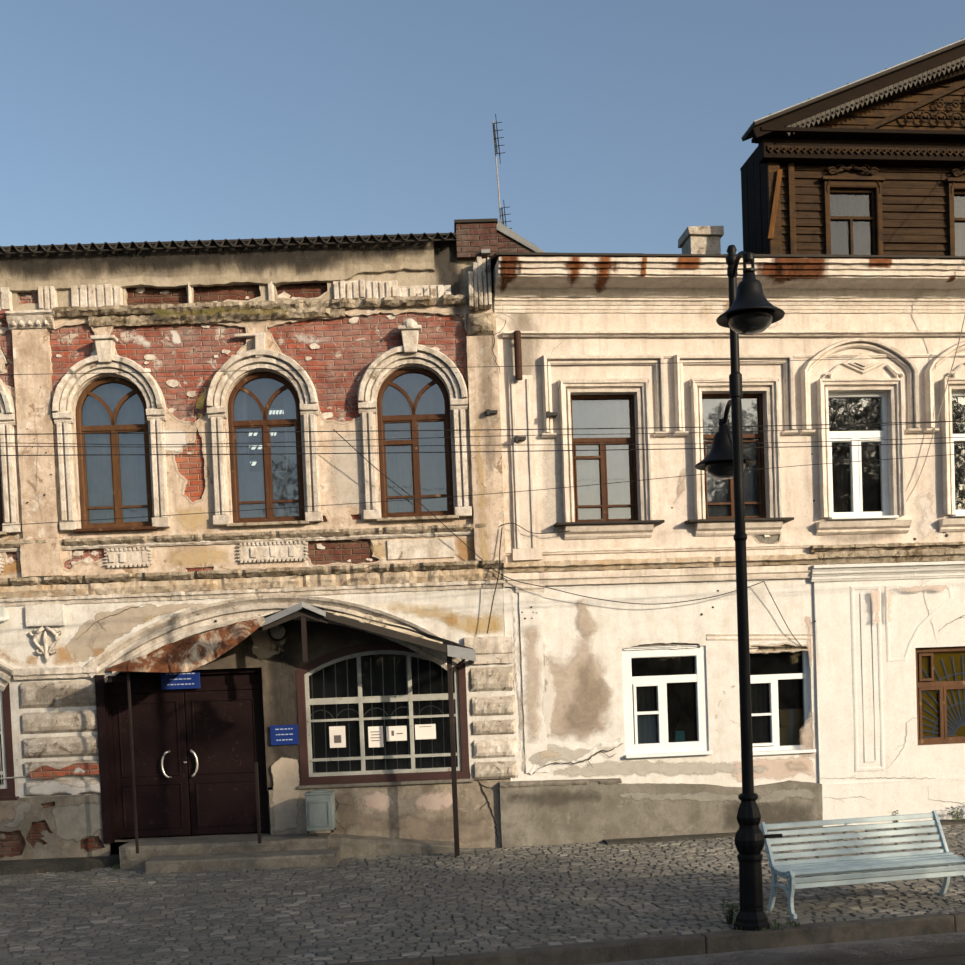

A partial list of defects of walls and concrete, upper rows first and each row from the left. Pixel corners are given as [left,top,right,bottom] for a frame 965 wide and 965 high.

spalling [274,282,329,300]
corrosion [501,256,522,291]
corrosion [566,257,617,291]
corrosion [758,258,826,283]
spalling [0,319,15,390]
spalling [48,320,96,398]
spalling [265,310,470,424]
spalling [108,285,262,529]
spalling [63,548,106,572]
damp [519,602,611,739]
crack [820,719,965,805]
spalling [0,763,104,858]